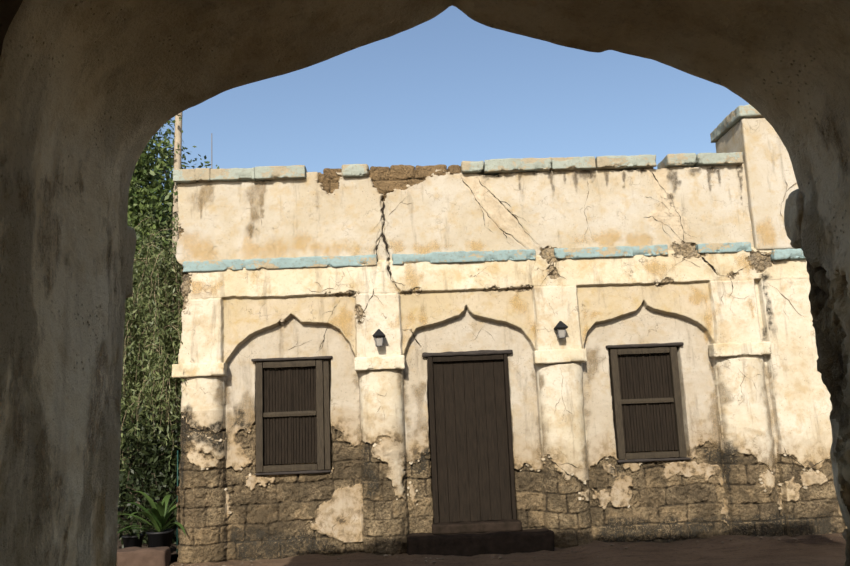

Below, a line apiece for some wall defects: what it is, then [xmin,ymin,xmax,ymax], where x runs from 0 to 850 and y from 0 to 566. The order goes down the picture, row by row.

spalling [315,168,342,195]
crack [289,201,410,357]
spalling [369,164,461,201]
crack [461,177,534,246]
spalling [540,246,562,279]
spalling [670,240,708,260]
crack [647,172,749,310]
spalling [745,249,776,273]
spalling [514,255,850,566]
spalling [176,411,434,564]